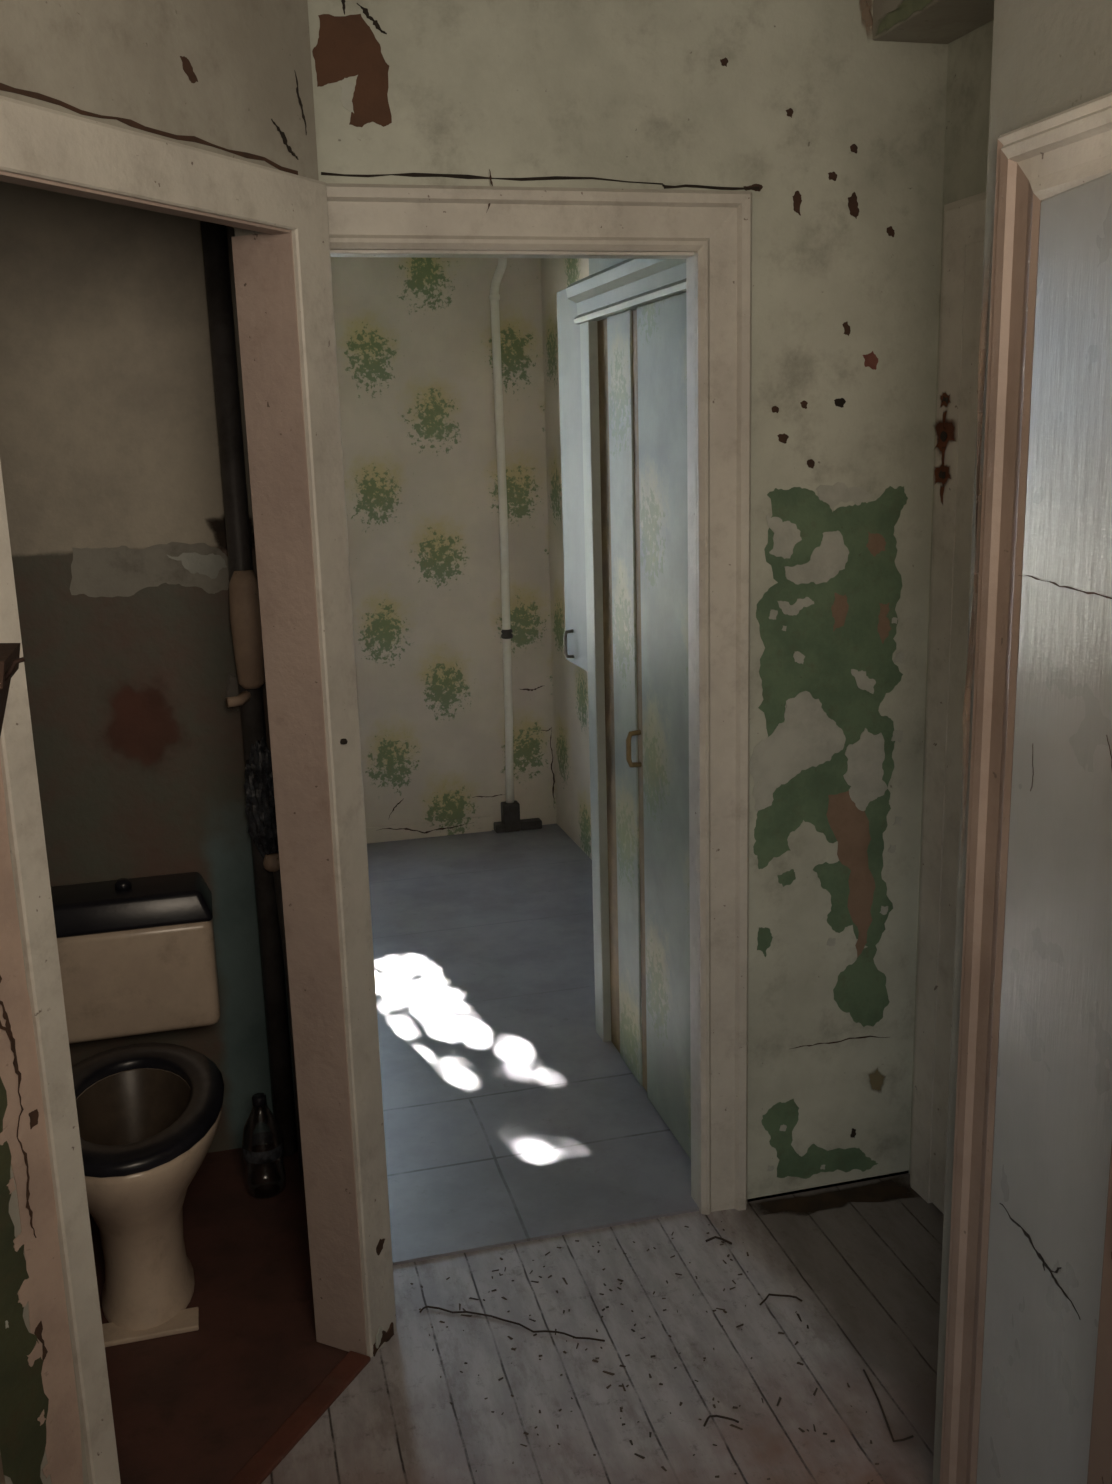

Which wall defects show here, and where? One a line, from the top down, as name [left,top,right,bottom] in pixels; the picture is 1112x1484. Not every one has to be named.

crack [341,0,387,35]
peeling [339,78,355,113]
crack [0,70,759,213]
peeling [792,191,802,216]
peeling [848,192,859,218]
peeling [863,351,878,370]
rust [934,392,956,504]
peeling [749,482,908,1027]
peeling [0,760,83,1484]
peeling [761,1099,878,1179]
crack [1000,1203,1081,1320]